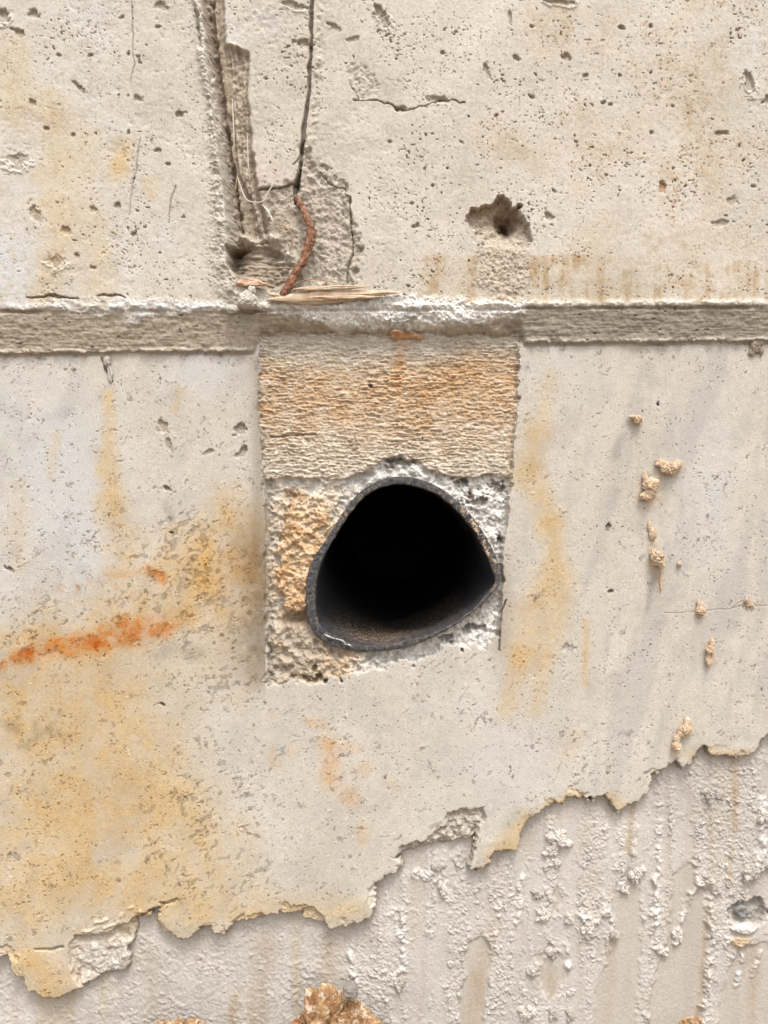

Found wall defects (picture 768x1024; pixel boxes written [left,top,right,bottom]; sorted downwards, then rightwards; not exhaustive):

spalling [192,0,365,306]
corrosion [280,195,316,296]
crack [258,0,355,284]
crack [349,83,466,112]
spalling [464,192,534,298]
spalling [260,456,511,688]
peeling [0,725,768,999]